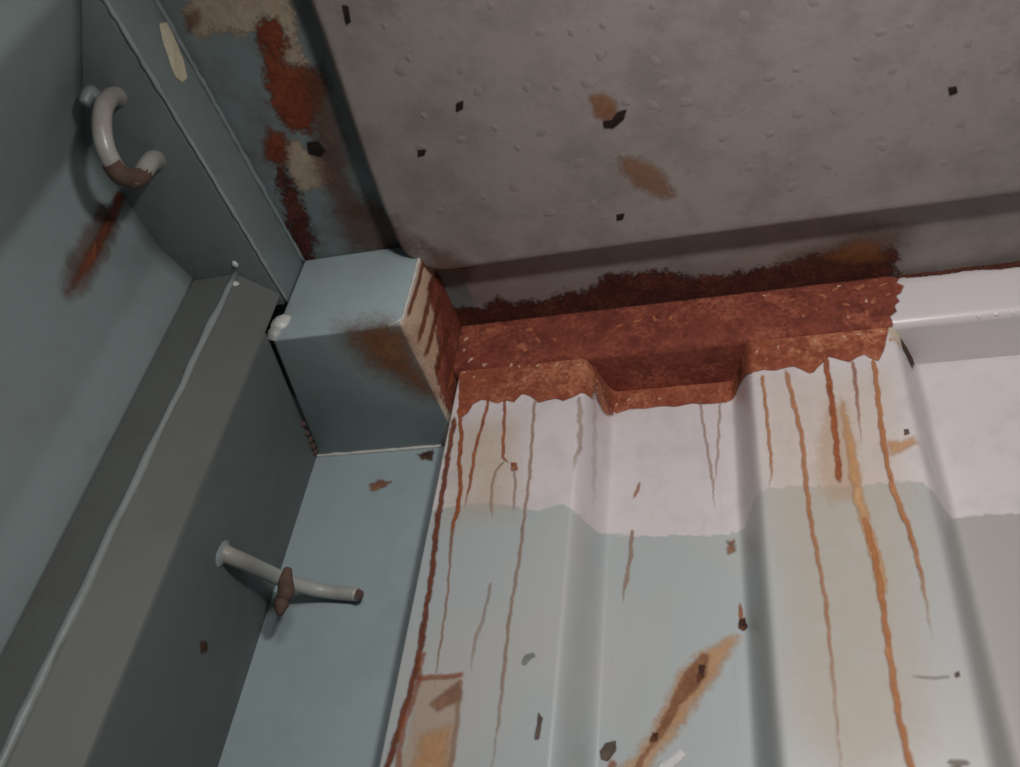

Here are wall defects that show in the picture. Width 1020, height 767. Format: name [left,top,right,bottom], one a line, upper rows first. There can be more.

rust [70,159,152,285]
rust [257,18,410,269]
rust [592,95,626,128]
rust [347,243,1020,767]